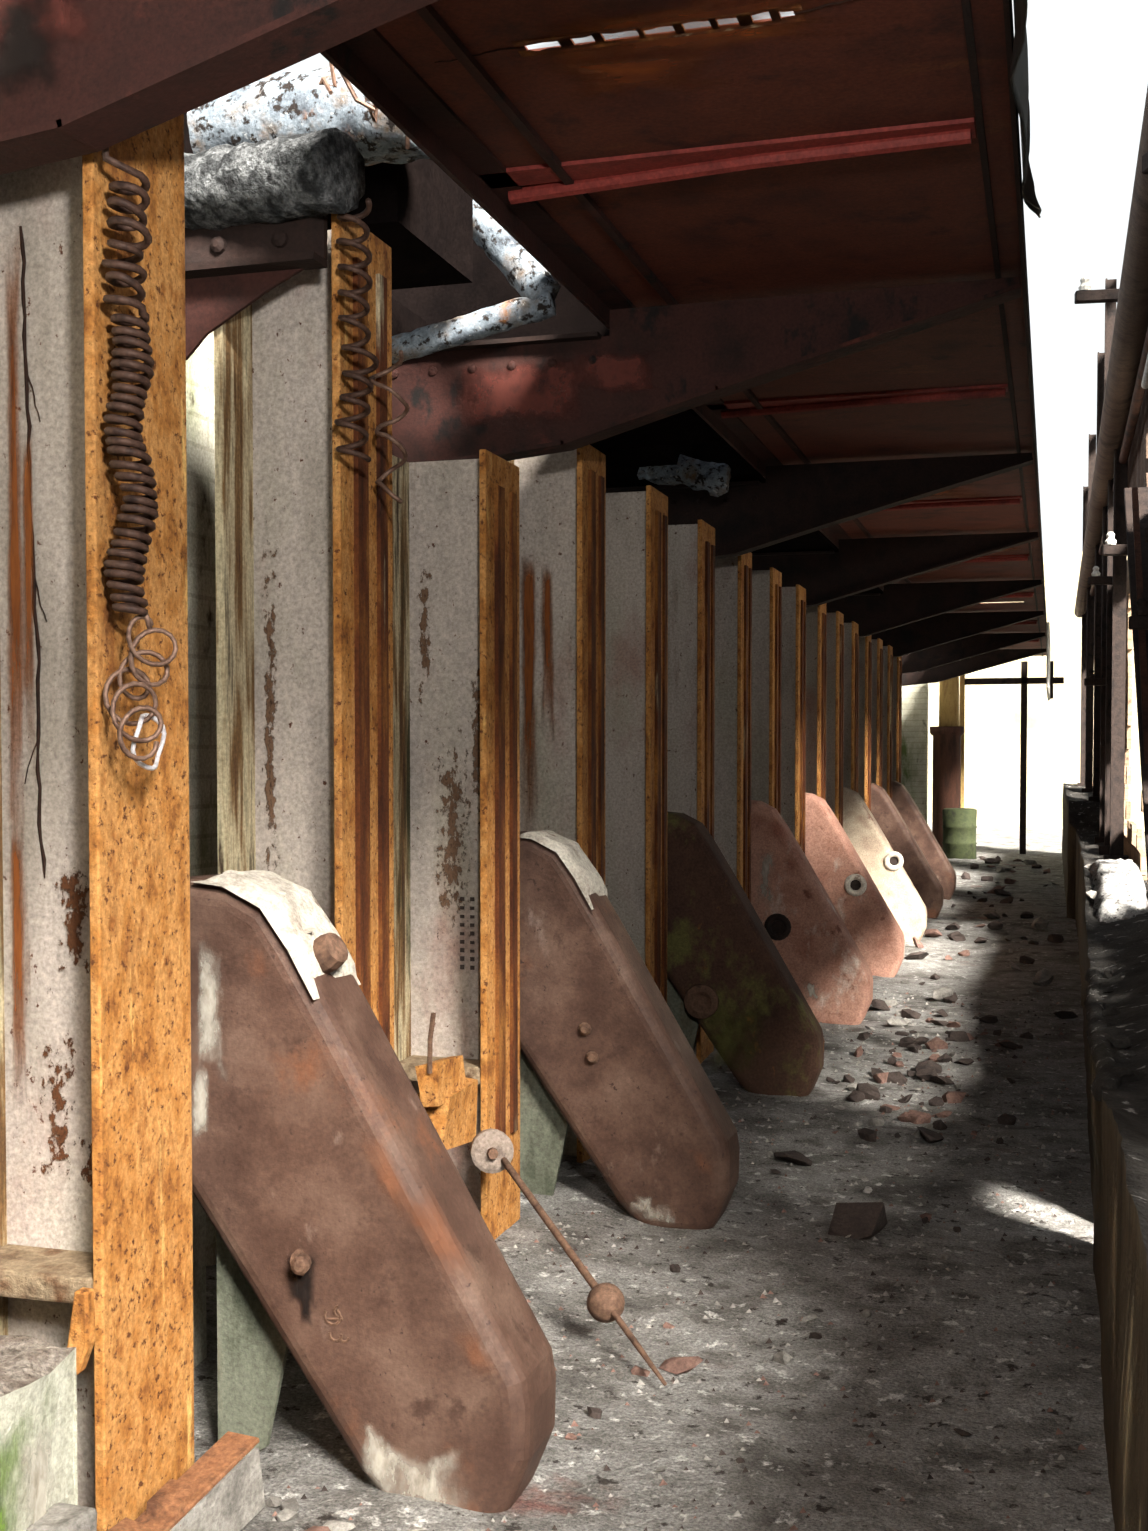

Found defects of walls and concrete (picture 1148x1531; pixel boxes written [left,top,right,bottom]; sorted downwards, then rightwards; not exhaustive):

crack [19,226,41,454]
corrosion [8,282,33,792]
crack [24,521,47,878]
corrosion [12,843,24,1057]
corrosion [53,861,90,974]
corrosion [39,1037,92,1188]